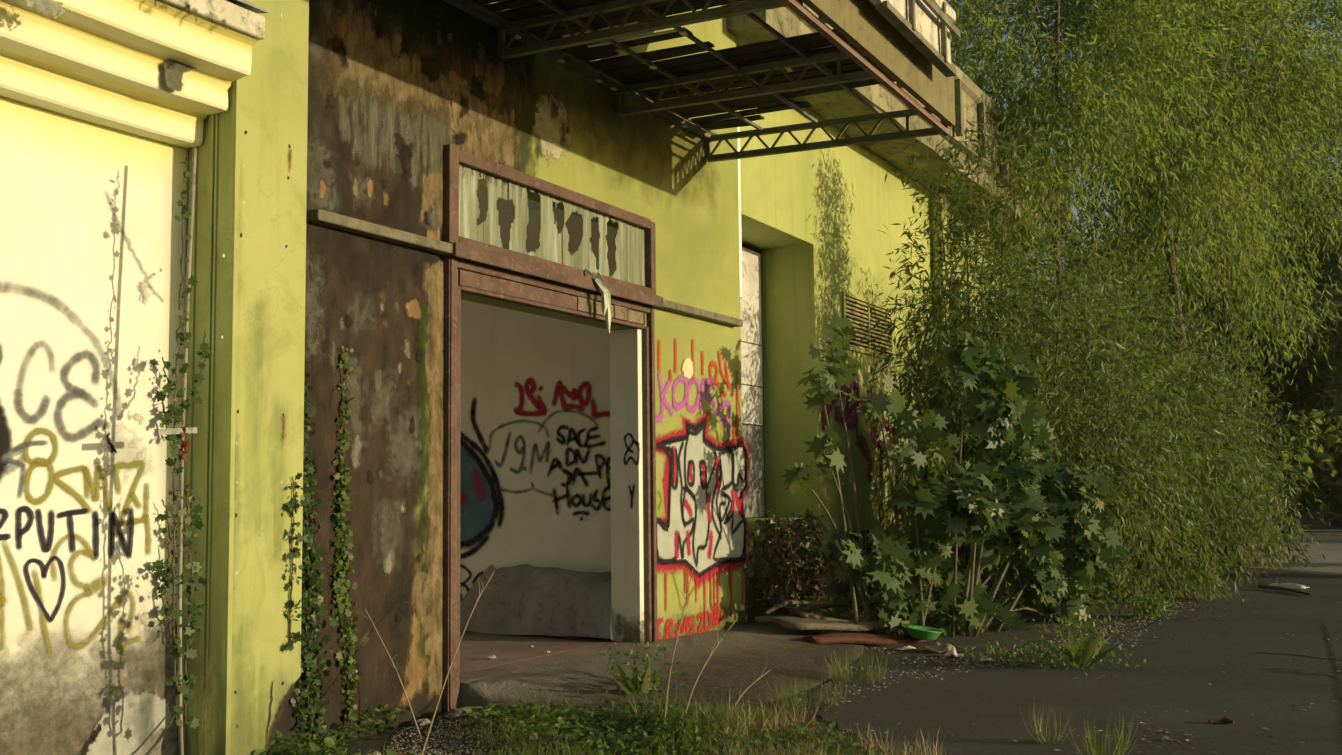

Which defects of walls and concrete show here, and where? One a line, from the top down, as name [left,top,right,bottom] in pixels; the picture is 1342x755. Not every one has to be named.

flaking render [312,0,572,240]
flaking render [351,423,382,483]
flaking render [379,262,444,705]
flaking render [0,612,178,755]